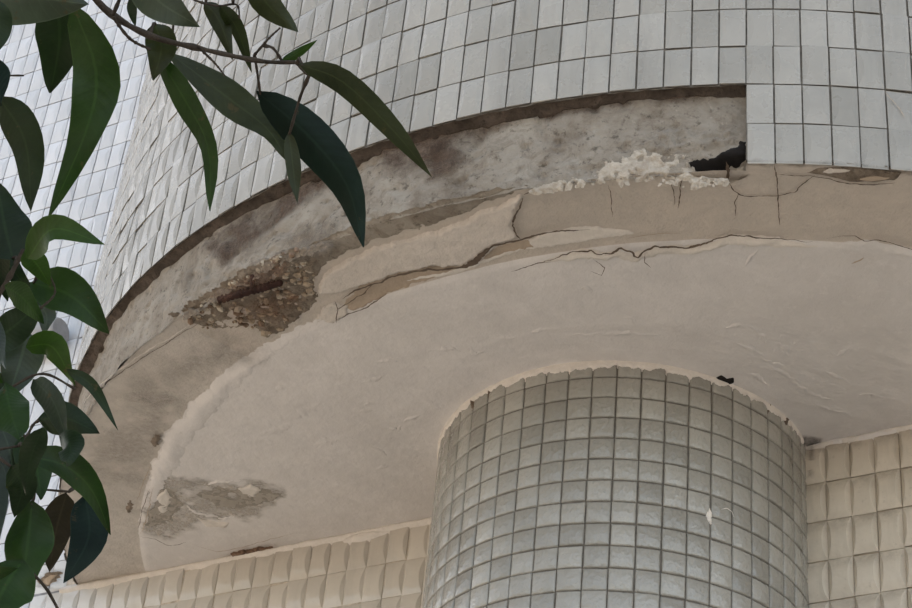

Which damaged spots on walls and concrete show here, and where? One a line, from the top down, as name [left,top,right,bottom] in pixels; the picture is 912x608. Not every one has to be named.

crack [726,162,755,216]
crack [774,166,815,224]
flaking render [806,163,901,185]
spalling [79,85,817,388]
crack [335,192,579,321]
crack [827,236,912,264]
spalling [69,381,96,415]
peeling [140,478,283,546]